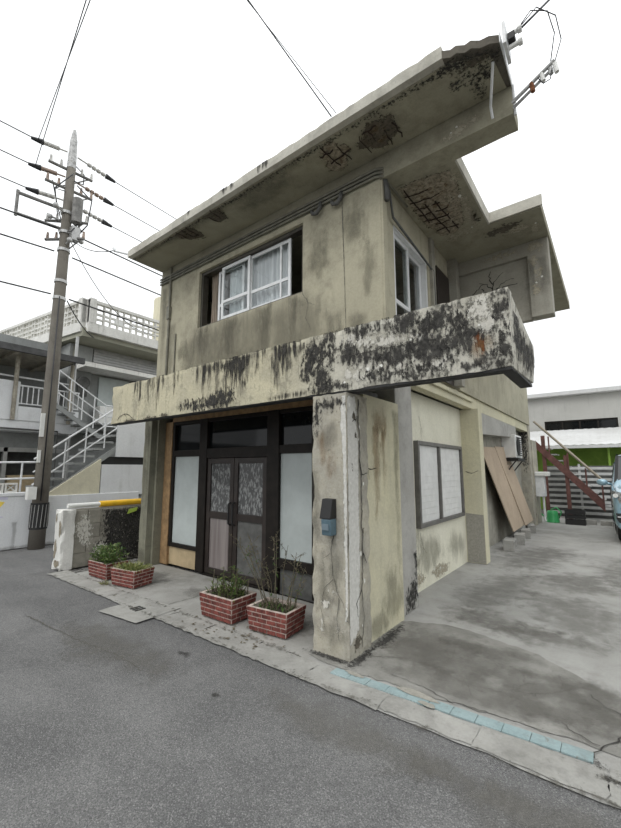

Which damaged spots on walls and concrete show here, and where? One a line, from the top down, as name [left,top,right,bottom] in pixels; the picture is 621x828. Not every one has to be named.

water stain [448,57,491,100]
spalling [319,114,403,172]
spalling [399,170,481,242]
crack [474,272,517,294]
water stain [180,288,535,437]
rust [474,332,485,355]
crack [320,399,621,758]